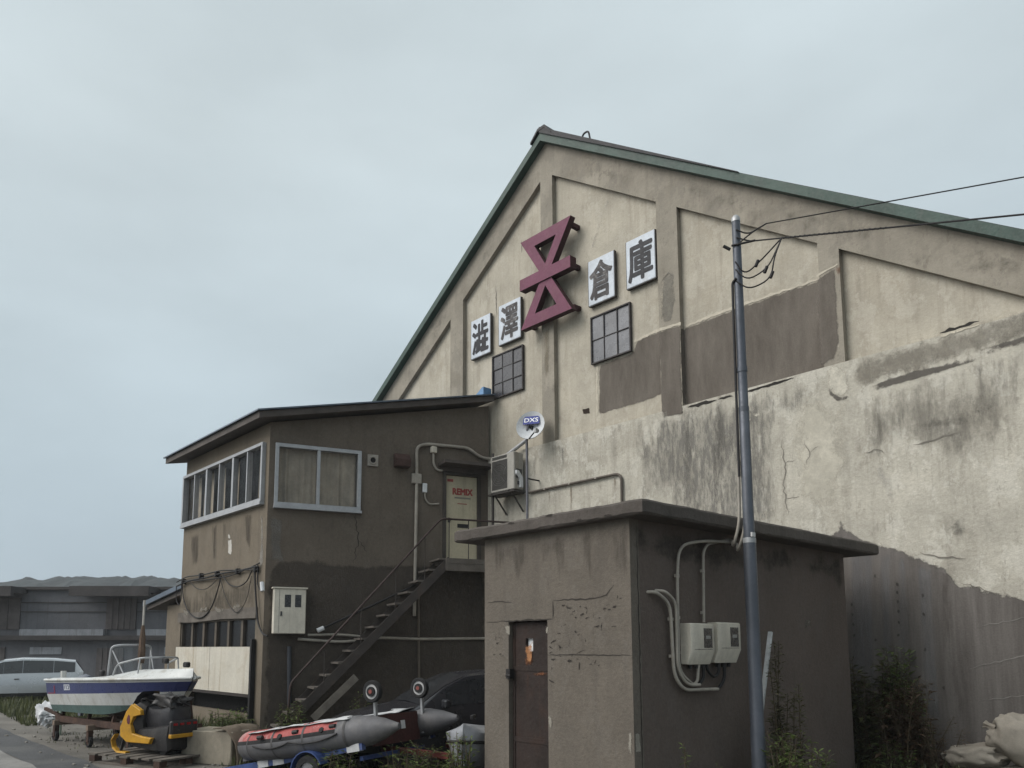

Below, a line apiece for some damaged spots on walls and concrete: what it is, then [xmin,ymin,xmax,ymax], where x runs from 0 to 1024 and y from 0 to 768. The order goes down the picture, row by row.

peeling [857,315,1024,383]
water stain [644,406,768,517]
crack [781,441,819,513]
crack [488,526,643,768]
peeling [832,526,1024,768]